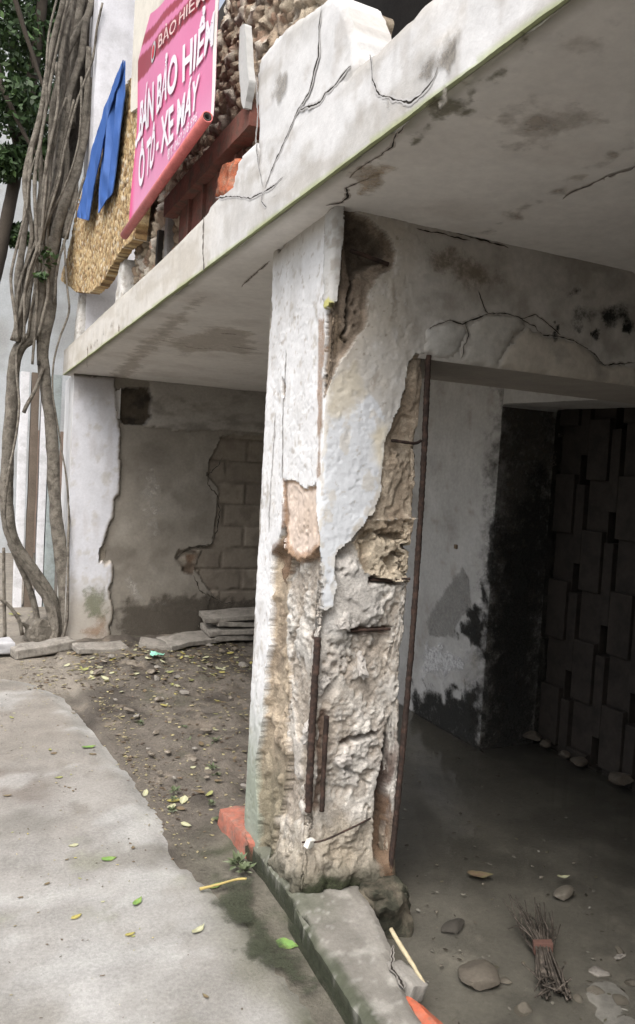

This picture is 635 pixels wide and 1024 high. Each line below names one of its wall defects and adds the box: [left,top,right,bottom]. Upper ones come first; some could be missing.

crack [202,5,438,270]
crack [563,166,635,199]
crack [430,290,635,367]
mould [578,305,634,340]
hole [115,386,154,426]
spalling [174,548,202,575]
leakage [412,391,563,752]
spalling [255,352,428,893]